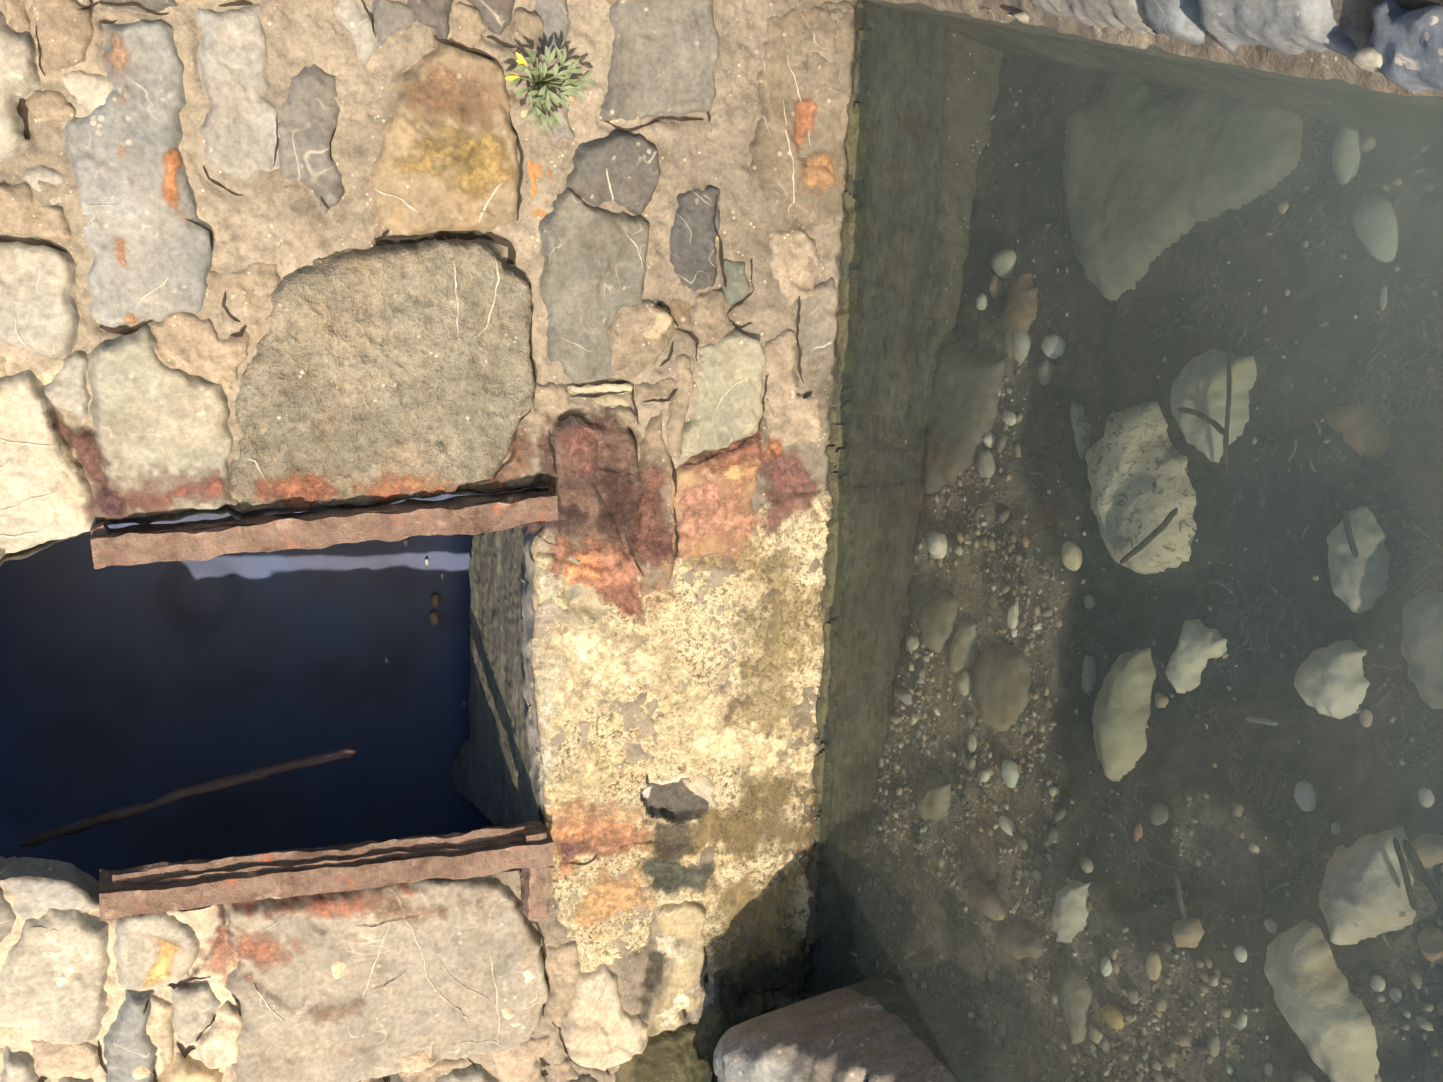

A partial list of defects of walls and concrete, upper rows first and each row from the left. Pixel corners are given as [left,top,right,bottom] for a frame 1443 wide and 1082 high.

rust [49,411,230,522]
rust [257,475,337,509]
rust [357,410,817,624]
rust [179,904,291,989]
rust [279,884,445,922]
rust [547,799,656,937]